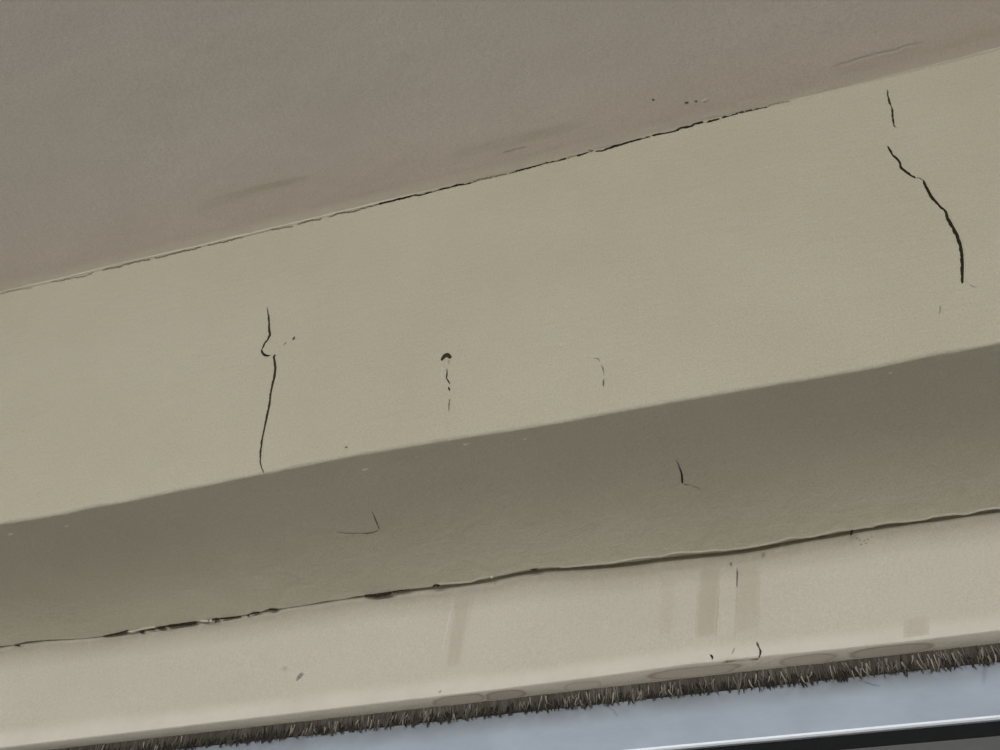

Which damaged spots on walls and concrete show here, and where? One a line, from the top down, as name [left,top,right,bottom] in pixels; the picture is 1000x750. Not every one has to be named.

crack [272,107,767,230]
crack [886,89,966,284]
crack [54,237,242,282]
crack [259,308,295,473]
crack [103,608,278,637]
crack [364,584,440,598]